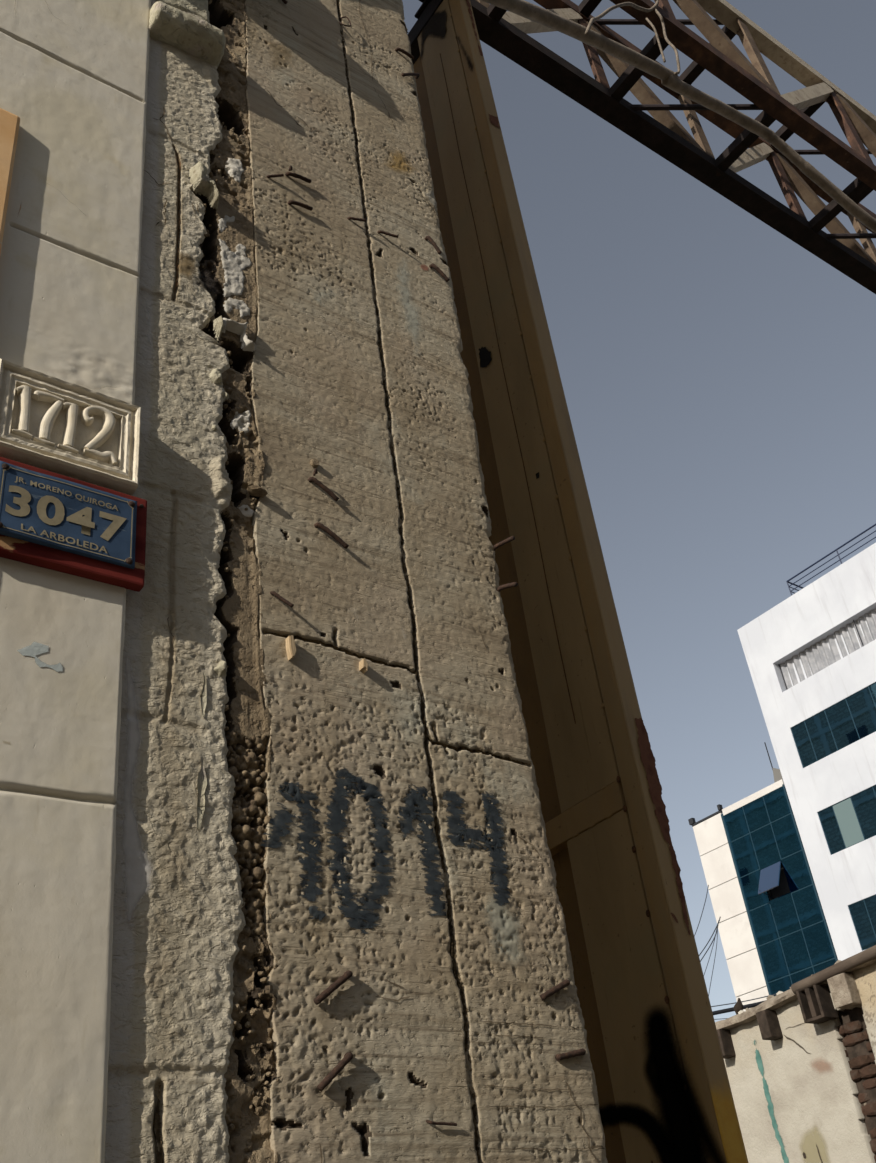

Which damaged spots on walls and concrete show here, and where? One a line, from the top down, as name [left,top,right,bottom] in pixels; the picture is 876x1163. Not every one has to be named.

hole [208,0,235,29]
hole [215,97,248,136]
spalling [189,154,278,1092]
crack [265,0,606,1163]
spalling [271,1118,302,1131]
flaking render [838,1007,876,1162]